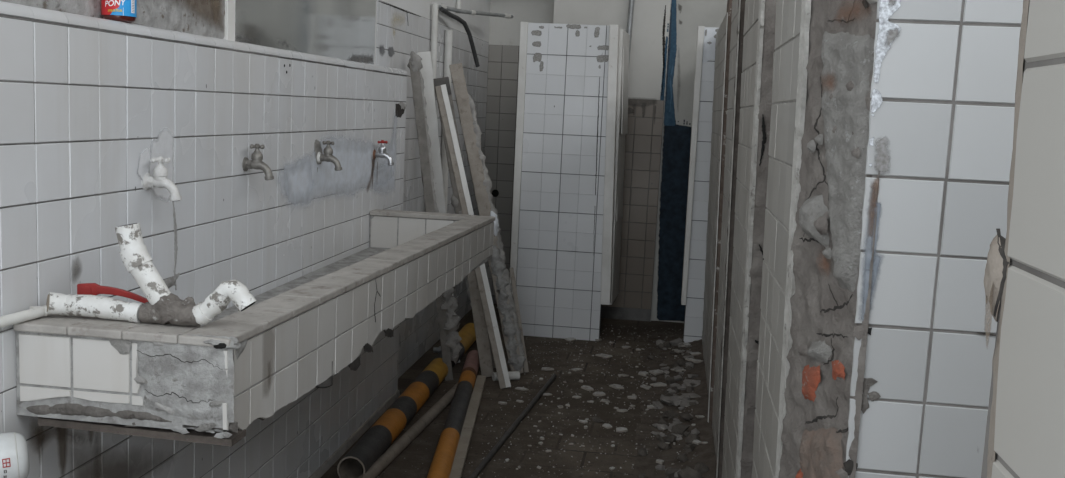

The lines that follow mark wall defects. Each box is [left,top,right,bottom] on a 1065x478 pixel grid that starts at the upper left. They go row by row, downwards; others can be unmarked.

crack [806,76,829,201]
spalling [775,0,901,478]
spalling [26,332,248,438]